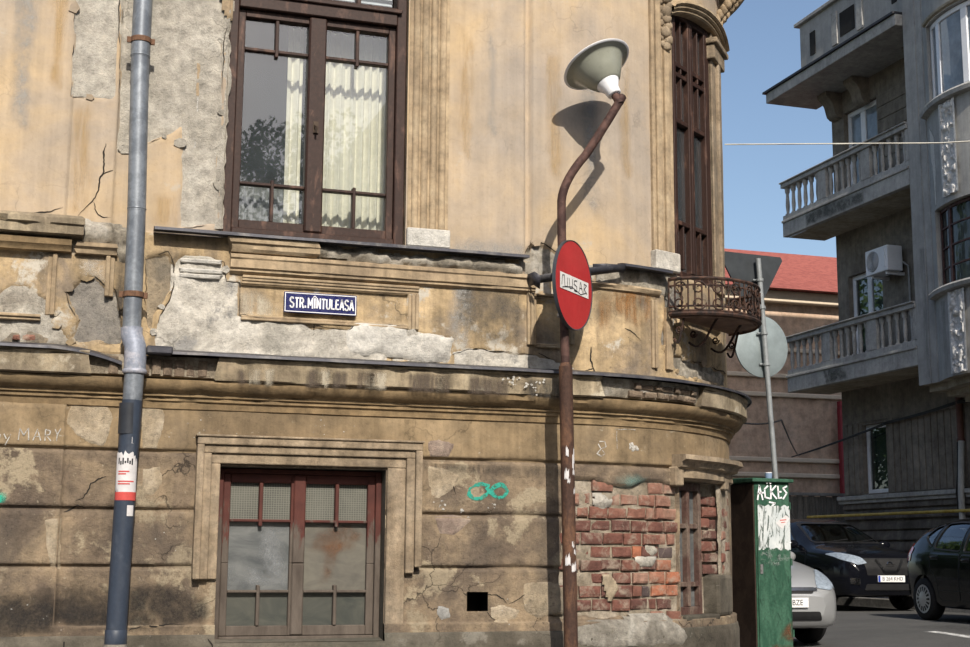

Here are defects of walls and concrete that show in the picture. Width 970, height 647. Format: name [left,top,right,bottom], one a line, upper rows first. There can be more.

flaking render [69,0,133,154]
flaking render [148,0,235,229]
crack [34,146,116,218]
flaking render [0,273,122,346]
flaking render [144,251,175,336]
peeling [67,405,113,446]
crack [64,476,106,512]
flaking render [575,480,681,621]
peeling [491,563,563,623]